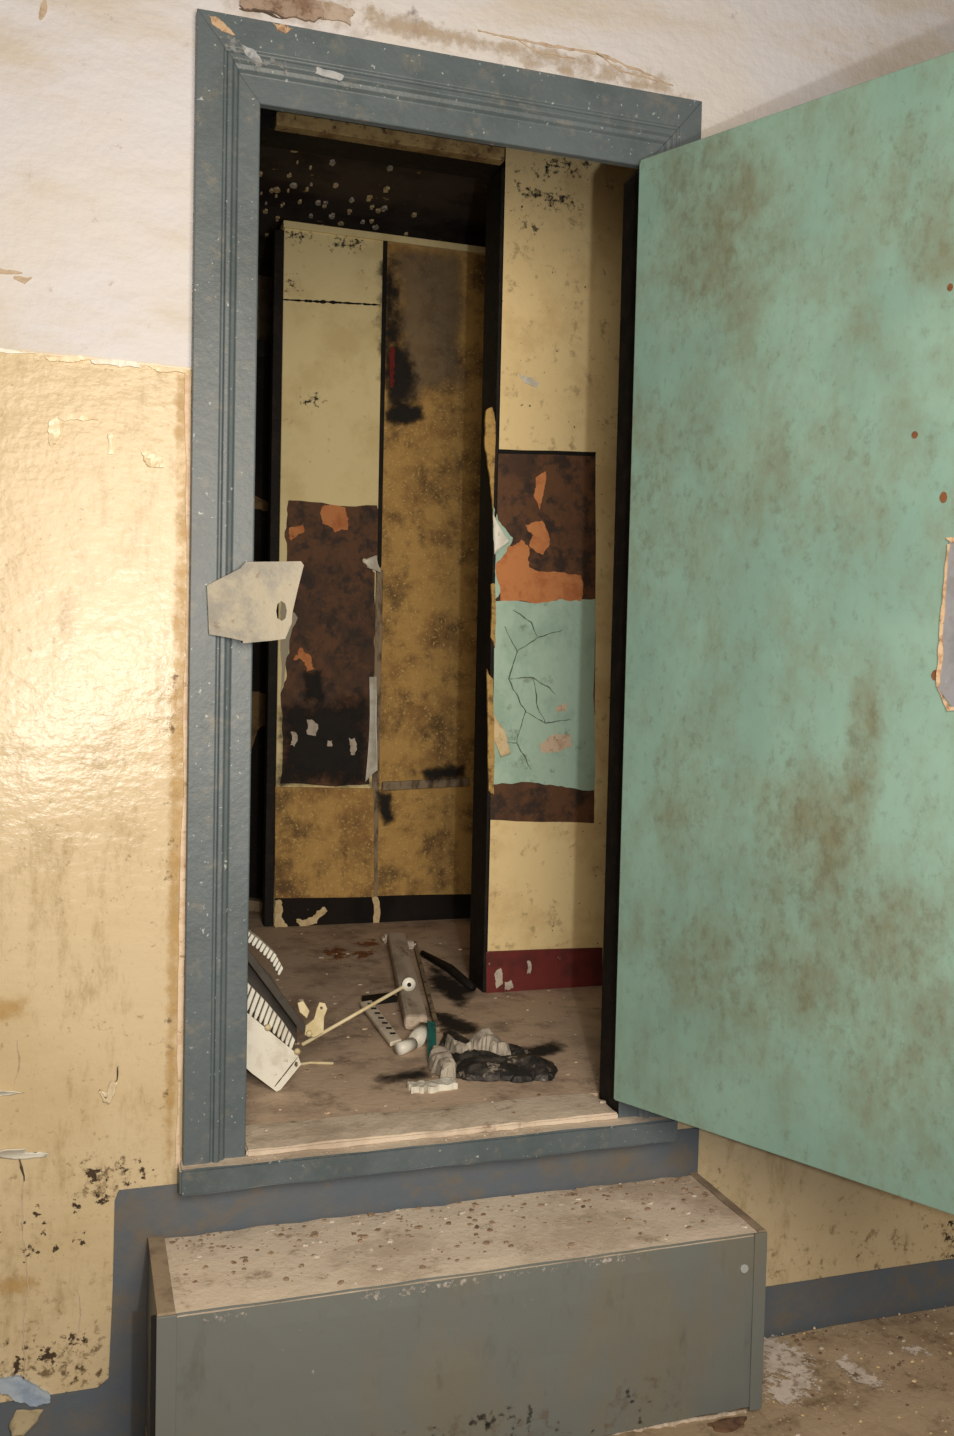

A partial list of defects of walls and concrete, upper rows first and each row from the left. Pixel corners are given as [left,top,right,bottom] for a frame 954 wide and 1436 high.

peeling [209,15,287,72]
flaking render [239,0,355,34]
peeling [315,67,344,82]
water stain [389,12,673,89]
peeling [279,500,381,787]
peeling [490,449,596,823]
crack [505,610,570,770]
water stain [72,1157,154,1214]
water stain [22,1204,86,1263]
peeling [0,1375,51,1436]